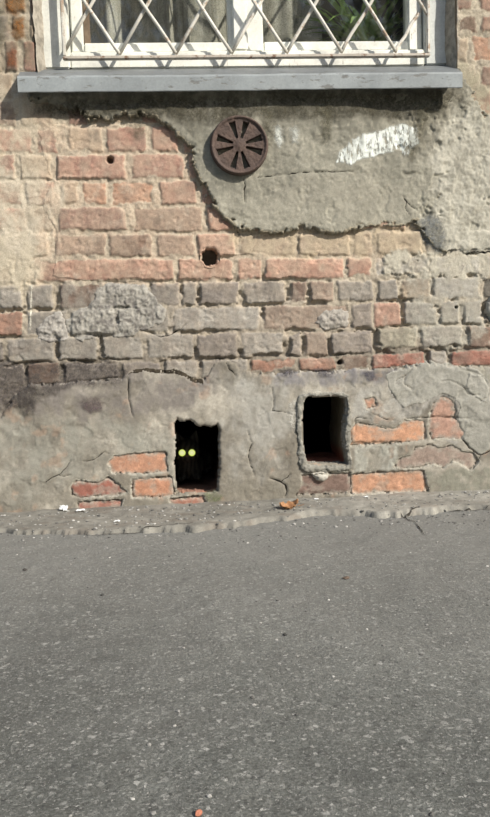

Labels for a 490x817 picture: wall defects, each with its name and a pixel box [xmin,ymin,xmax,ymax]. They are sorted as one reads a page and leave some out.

crack [127,368,203,415]
flaking render [296,360,490,496]
spalling [69,449,207,508]